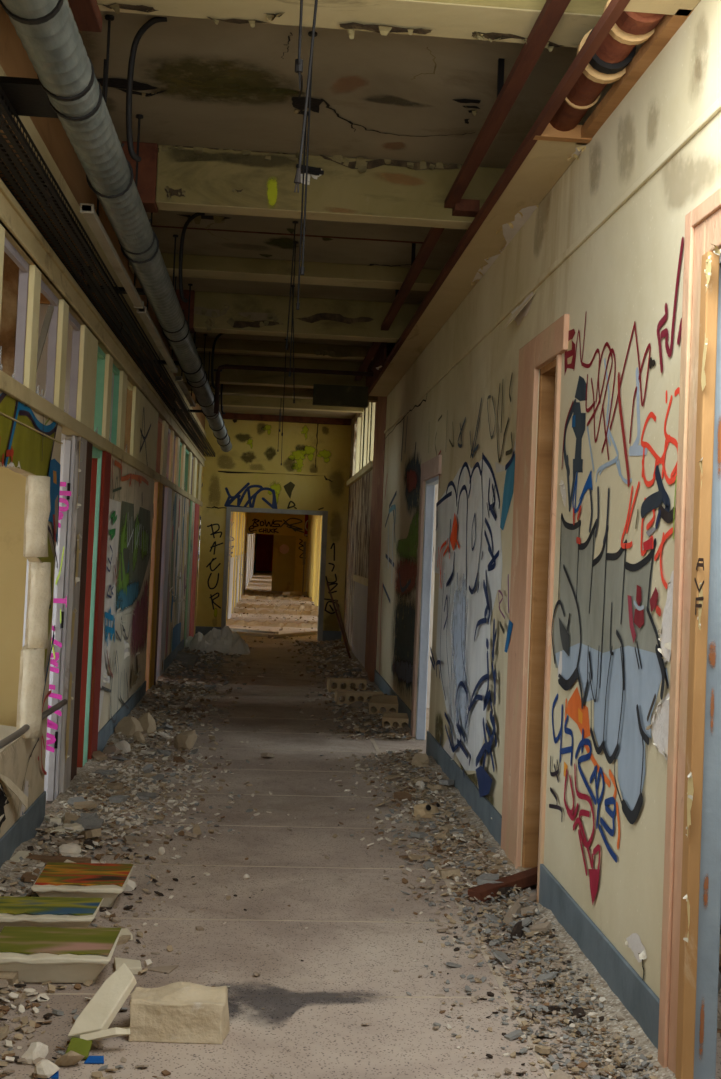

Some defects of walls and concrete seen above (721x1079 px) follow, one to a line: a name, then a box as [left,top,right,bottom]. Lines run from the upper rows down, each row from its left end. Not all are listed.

flaking render [340,22,432,39]
flaking render [472,31,527,44]
leakage [153,59,289,104]
crack [321,99,475,137]
peeling [704,244,721,291]
peeling [686,772,694,837]